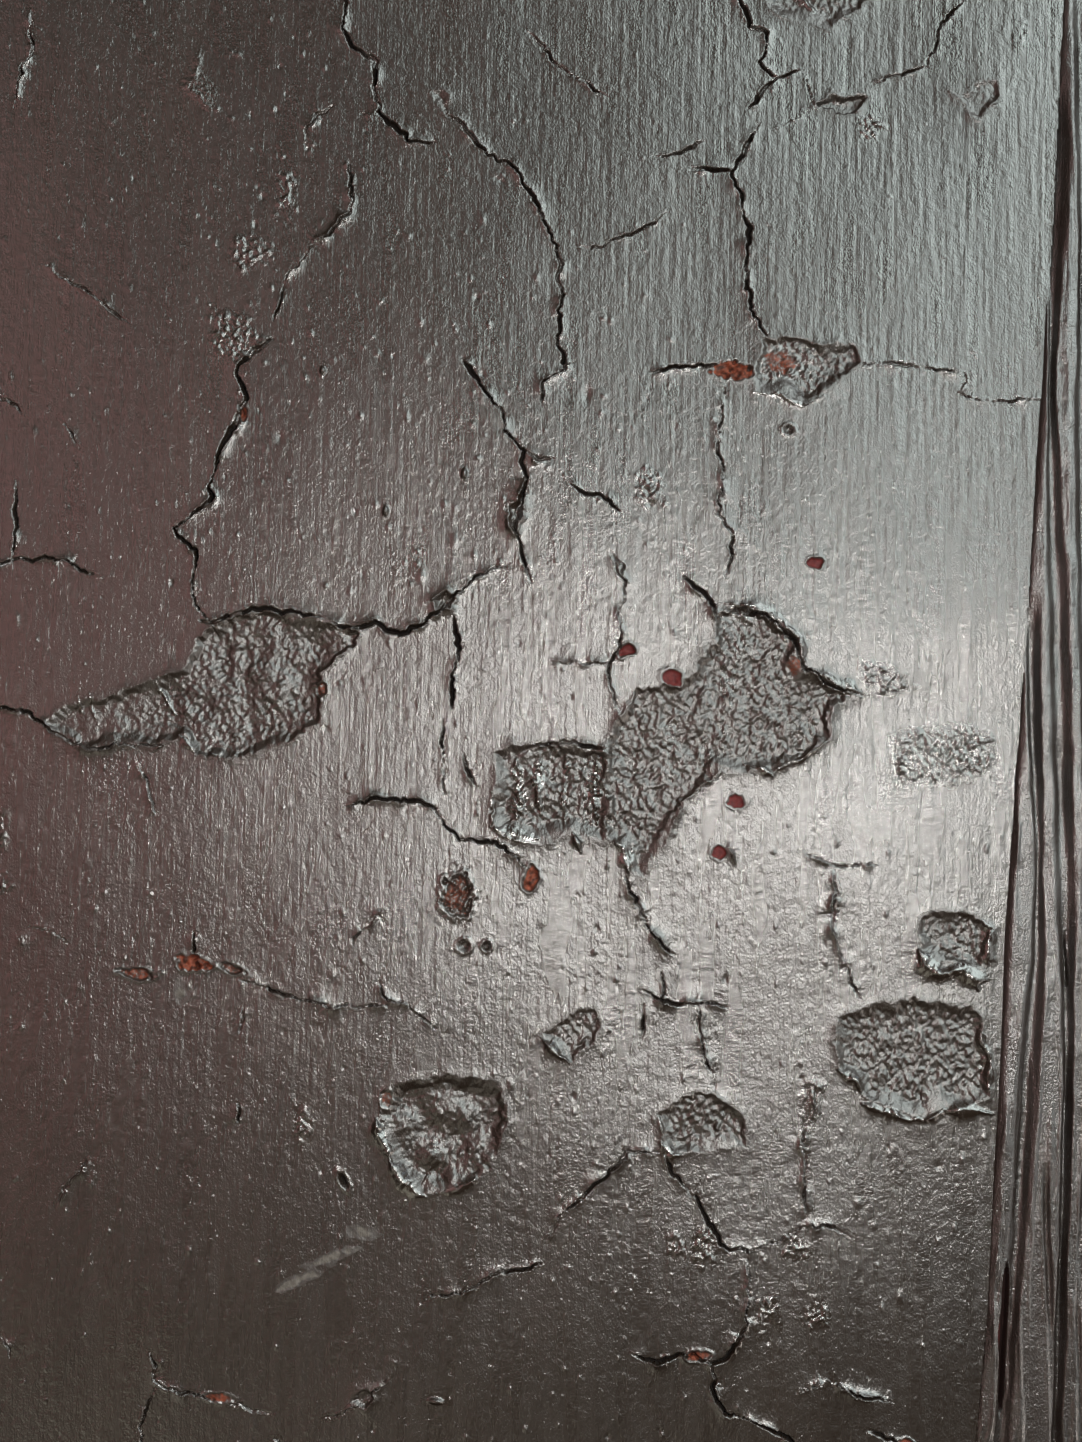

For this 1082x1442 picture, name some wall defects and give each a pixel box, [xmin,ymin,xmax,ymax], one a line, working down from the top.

crack [649,0,818,335]
crack [301,0,671,753]
corrosion [704,343,809,388]
crack [169,159,534,869]
crack [648,360,868,699]
corrosion [616,641,639,661]
corrosion [659,666,685,691]
peeling [484,740,606,851]
corrosion [725,792,750,811]
peeling [829,908,997,1123]
peeling [371,1069,513,1199]
peeling [655,1088,752,1161]